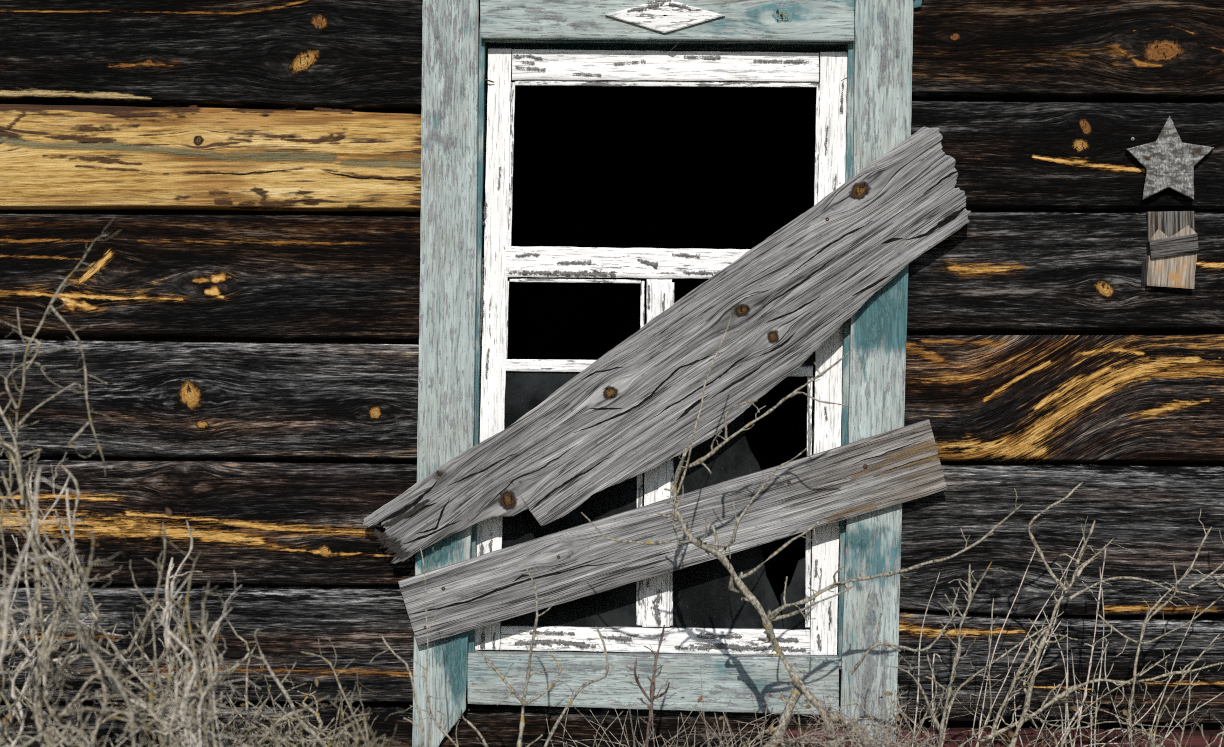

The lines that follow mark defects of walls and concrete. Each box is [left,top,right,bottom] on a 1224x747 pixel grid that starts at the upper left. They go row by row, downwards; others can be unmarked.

peeling [513,53,546,71]
crack [924,169,960,193]
crack [378,206,966,544]
peeling [675,599,832,654]
peeling [514,630,636,648]